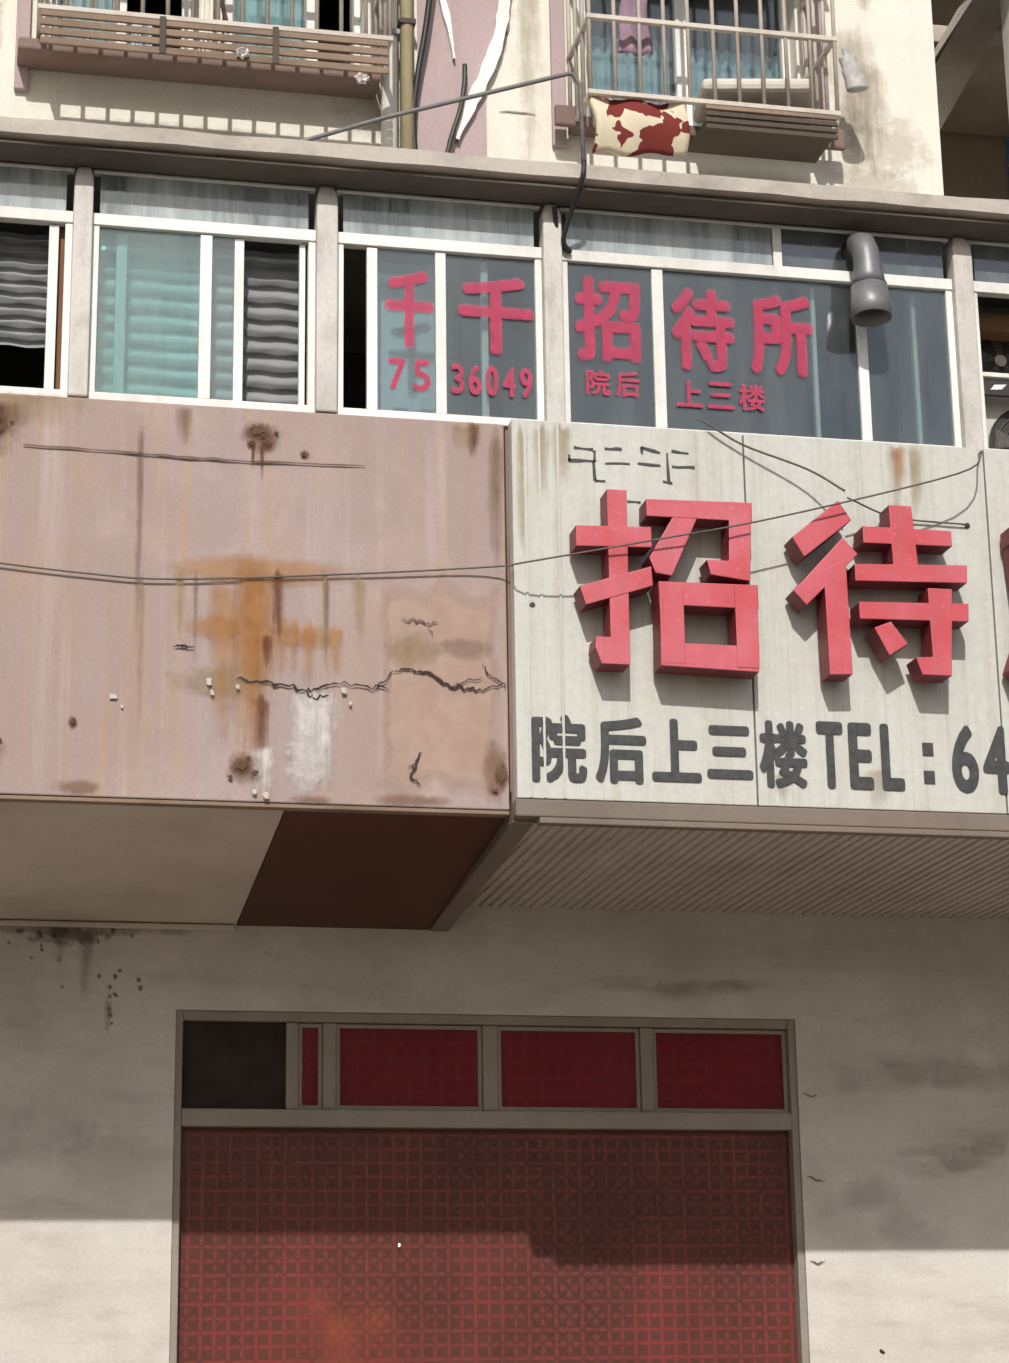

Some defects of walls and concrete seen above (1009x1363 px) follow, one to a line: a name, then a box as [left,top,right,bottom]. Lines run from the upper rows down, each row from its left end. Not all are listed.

rust [263,571,282,658]
crack [401,618,437,635]
crack [237,663,506,700]
rust [258,695,268,735]
leakage [8,927,99,959]